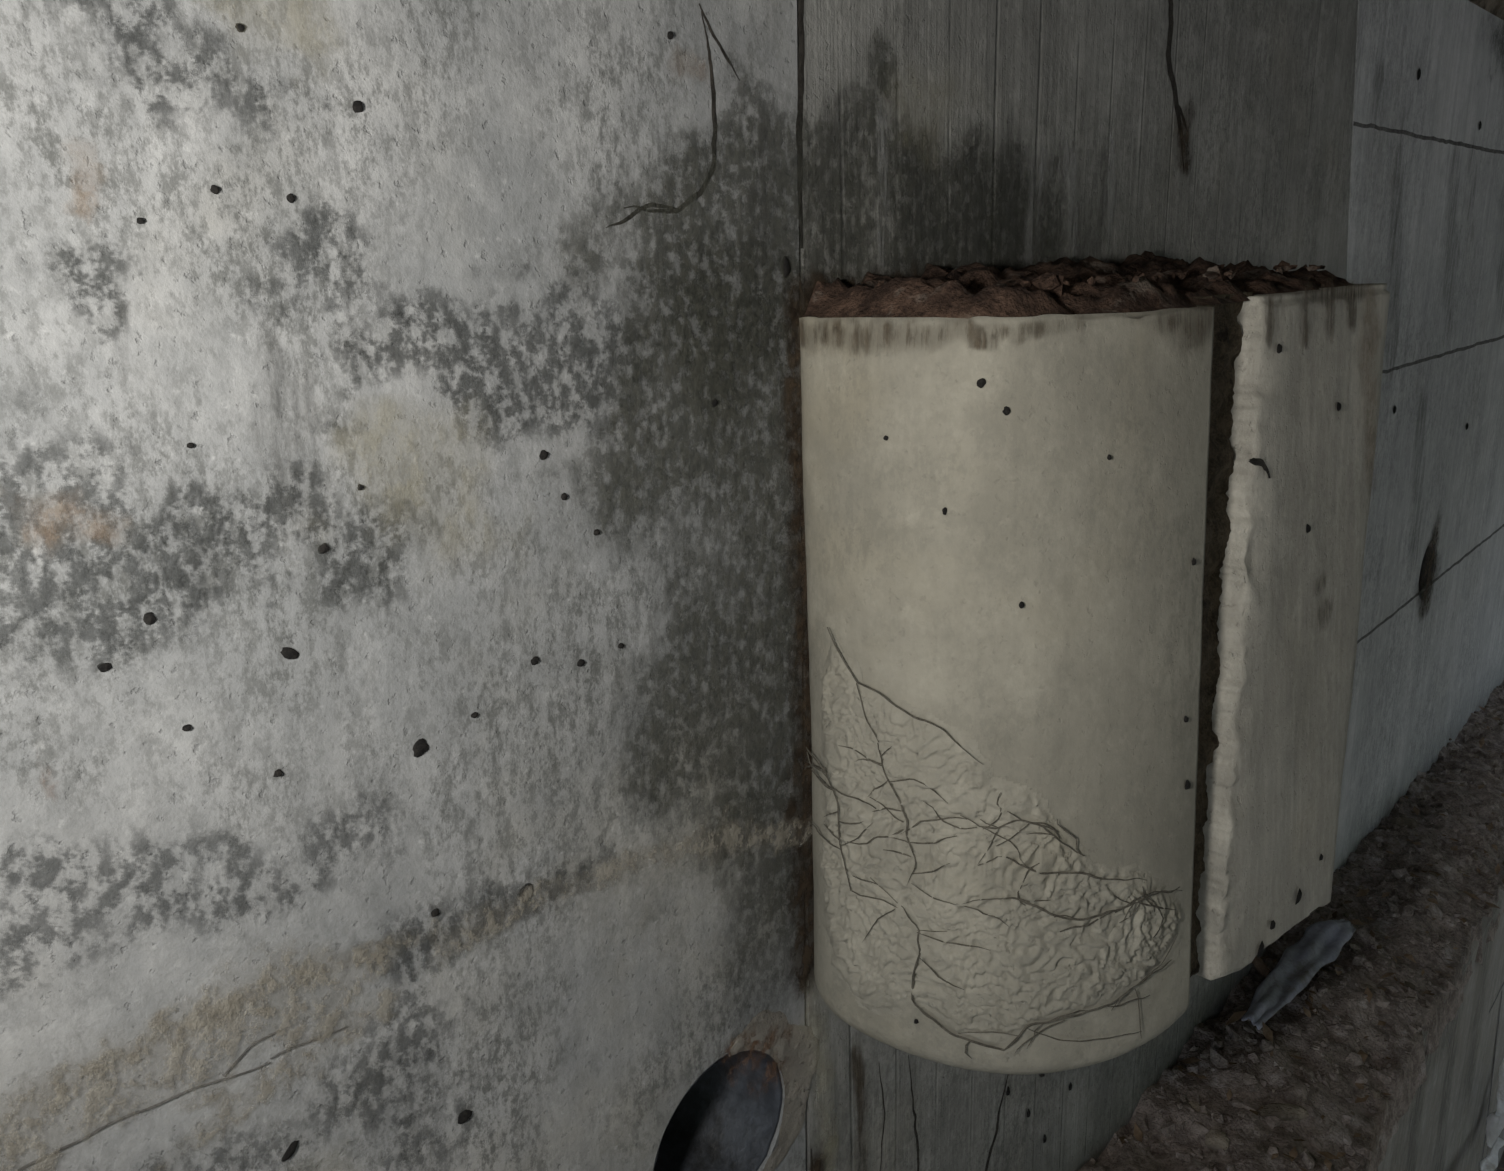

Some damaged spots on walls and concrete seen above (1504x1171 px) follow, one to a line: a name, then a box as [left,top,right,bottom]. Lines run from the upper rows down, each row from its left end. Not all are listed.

damp [102,0,266,113]
crack [606,3,740,228]
crack [1166,0,1187,173]
damp [0,40,1064,1171]
crack [805,627,1182,1171]
crack [16,1026,348,1171]